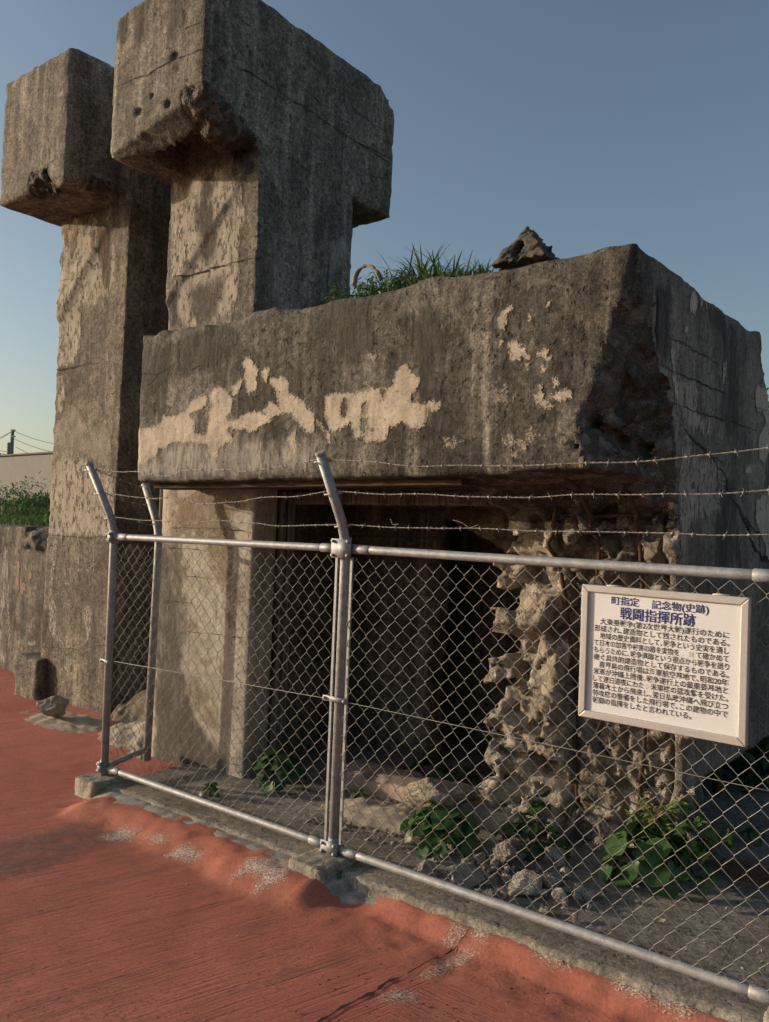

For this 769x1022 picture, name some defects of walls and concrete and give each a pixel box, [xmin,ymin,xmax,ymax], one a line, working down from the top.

spalling [27,165,62,199]
peeling [170,80,260,330]
crack [175,240,255,322]
peeling [138,356,442,466]
crack [651,286,769,562]
peeling [745,381,769,476]
peeling [755,492,769,560]
spalling [471,301,699,862]
crack [405,926,471,975]